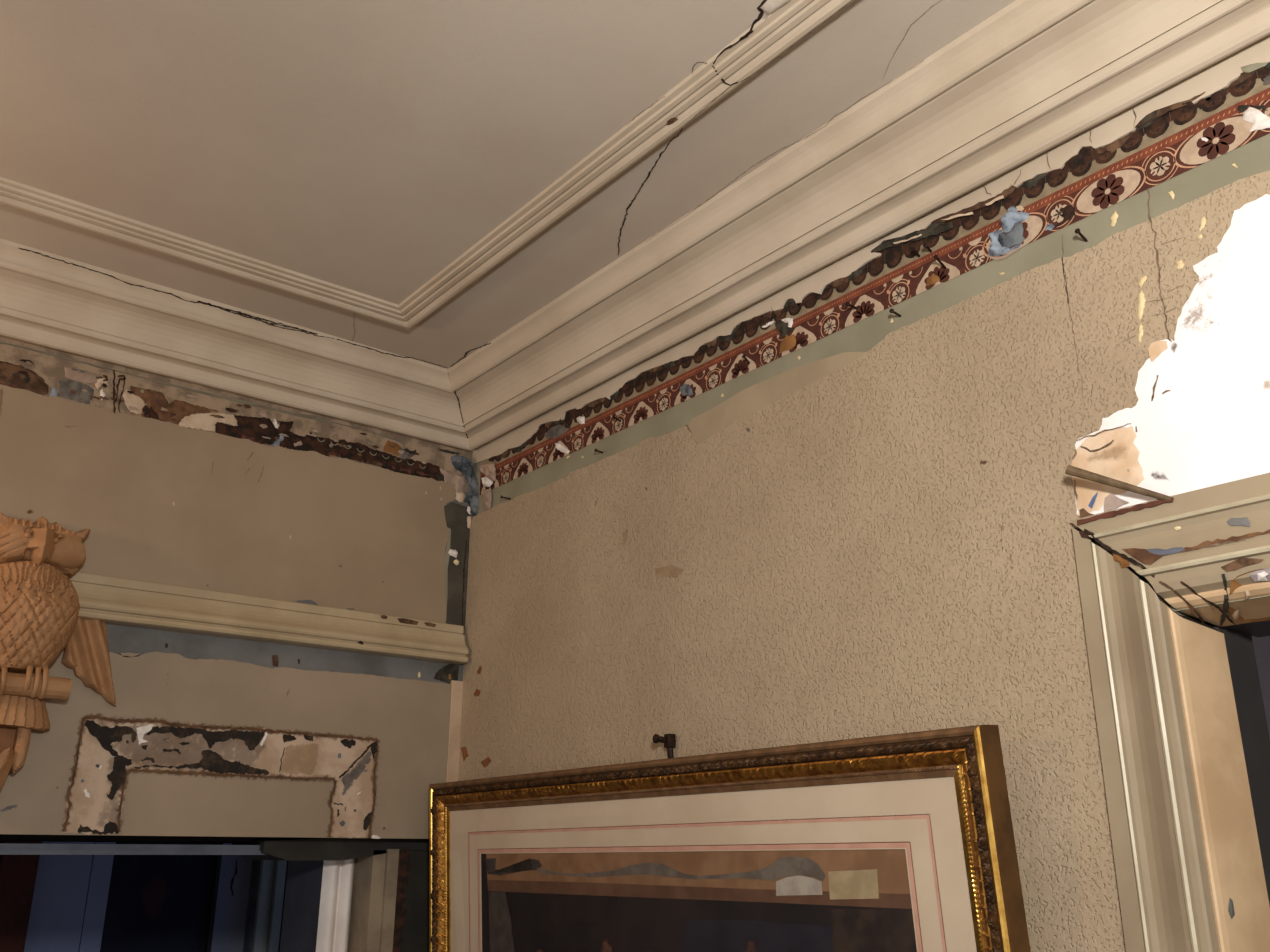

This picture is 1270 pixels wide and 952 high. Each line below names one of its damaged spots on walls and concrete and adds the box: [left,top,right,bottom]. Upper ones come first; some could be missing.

crack [618,0,940,254]
crack [19,248,468,438]
crack [1061,235,1084,399]
crack [1125,190,1184,342]
flaking render [0,336,496,528]
peeling [1146,547,1185,555]
peeling [1228,568,1270,623]